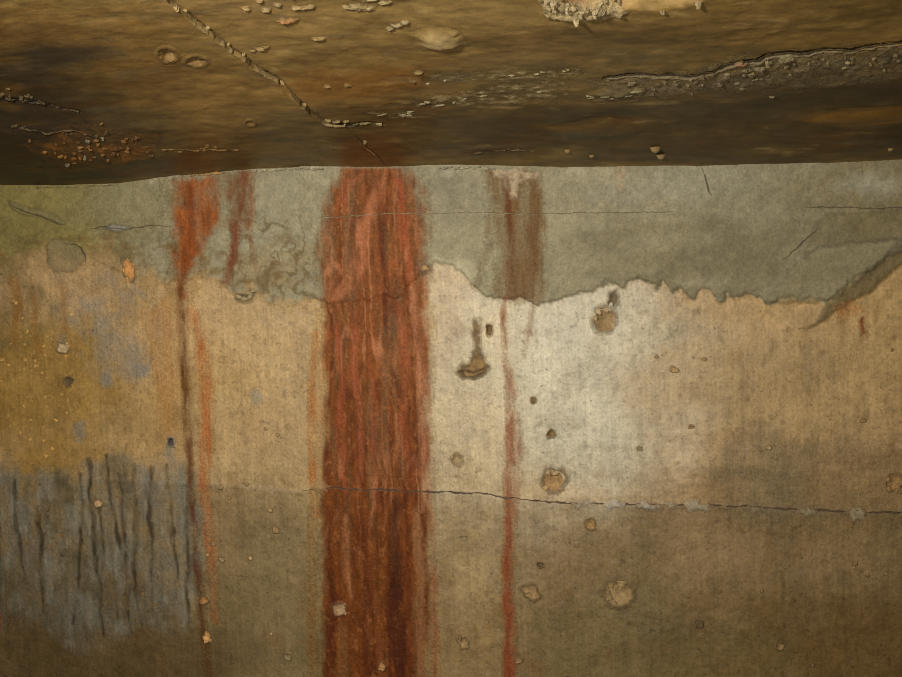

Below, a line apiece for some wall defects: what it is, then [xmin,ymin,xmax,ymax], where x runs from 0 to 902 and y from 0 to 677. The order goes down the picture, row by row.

leakage [0,133,136,186]
peeling [0,176,171,287]
peeling [207,166,338,312]
crack [162,0,386,165]
leakage [362,66,583,119]
spalling [538,0,704,27]
peeling [411,159,902,337]
leakage [0,259,206,661]
rust [156,131,259,677]
rust [304,127,443,677]
rust [470,166,549,677]
crack [302,481,902,523]